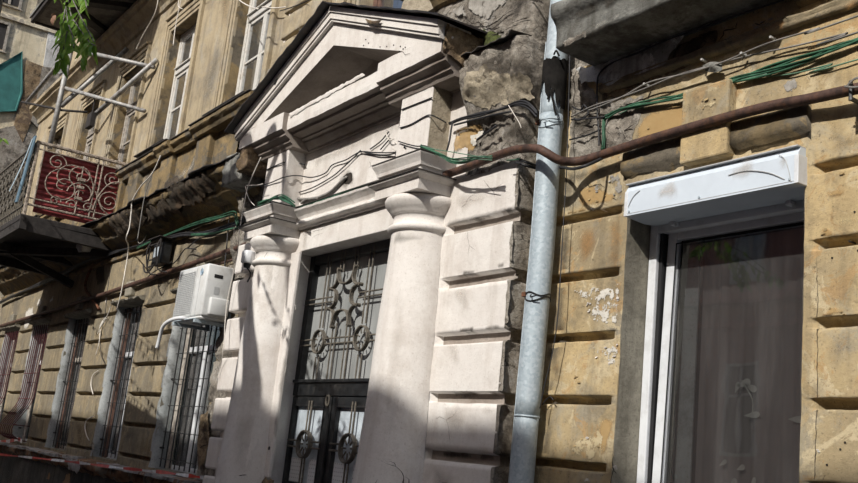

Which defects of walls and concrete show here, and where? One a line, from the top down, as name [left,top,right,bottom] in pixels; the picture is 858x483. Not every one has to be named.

peeling [453,0,506,19]
flaking render [462,58,535,110]
flaking render [563,30,718,157]
peeling [454,124,484,150]
peeling [574,288,619,323]
flaking render [197,411,209,469]
peeling [572,419,612,460]